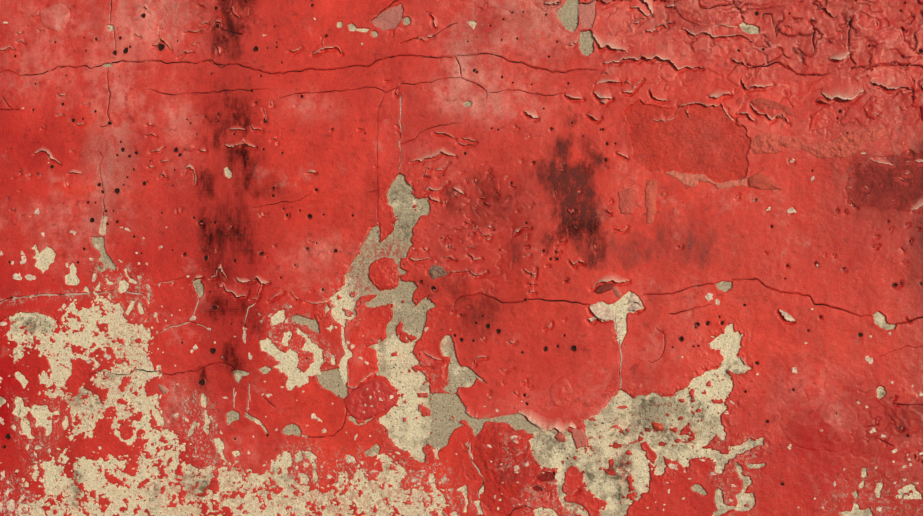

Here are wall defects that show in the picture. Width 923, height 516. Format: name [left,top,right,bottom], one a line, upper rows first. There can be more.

crack [21,0,590,220]
peeling [544,0,793,231]
peeling [817,48,923,103]
leakage [538,139,614,266]
peeling [836,150,923,225]
crack [454,293,587,305]
crack [644,284,713,363]
crack [741,278,873,317]